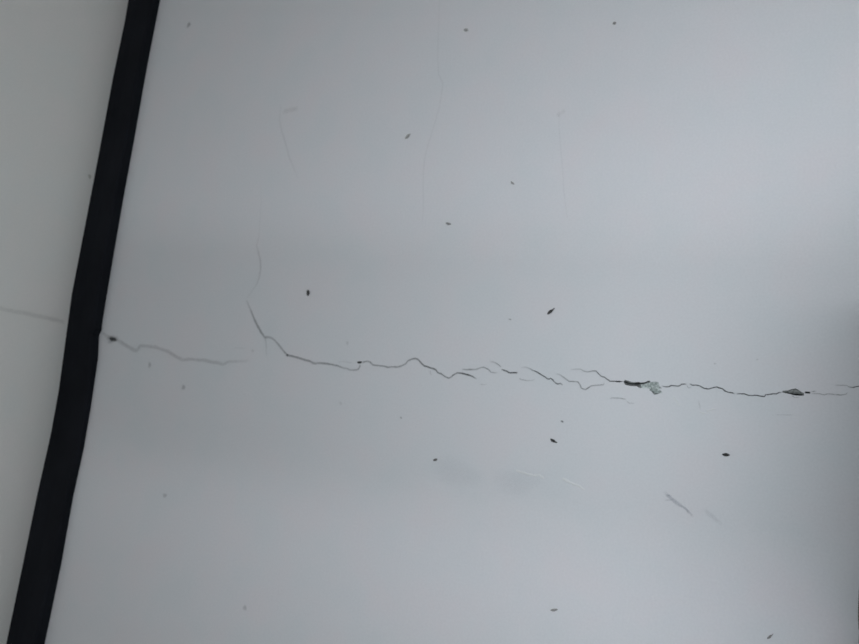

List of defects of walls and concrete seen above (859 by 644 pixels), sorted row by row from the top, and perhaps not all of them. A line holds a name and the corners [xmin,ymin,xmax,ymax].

crack [502,369,622,389]
crack [664,384,780,397]